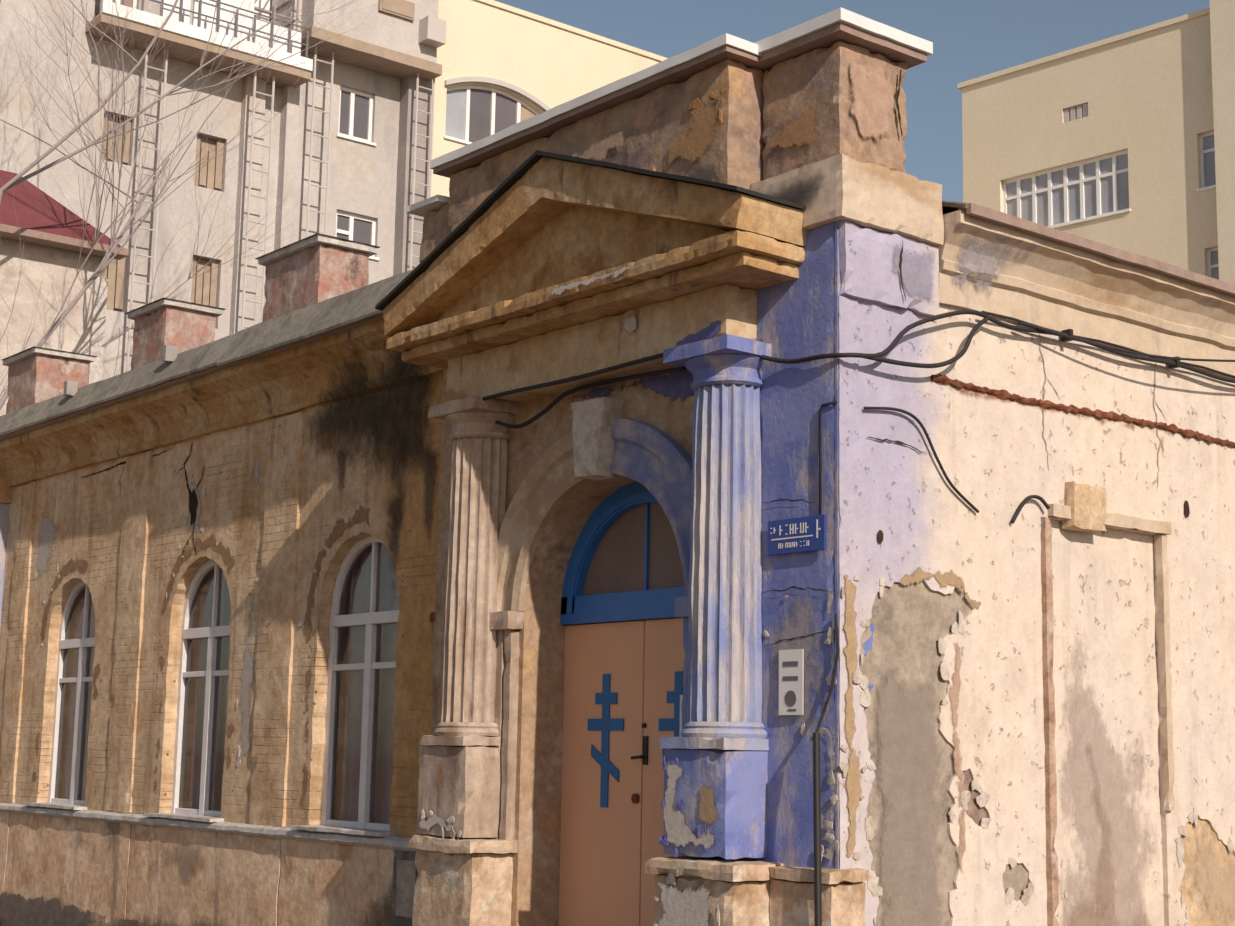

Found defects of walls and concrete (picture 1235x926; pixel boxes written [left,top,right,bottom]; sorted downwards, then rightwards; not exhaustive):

flaking render [652,89,725,171]
flaking render [850,60,902,140]
crack [82,444,206,562]
leakage [310,349,436,569]
flaking render [763,567,992,926]
peeling [659,756,718,857]
peeling [653,873,720,926]
flaking render [1175,807,1235,926]